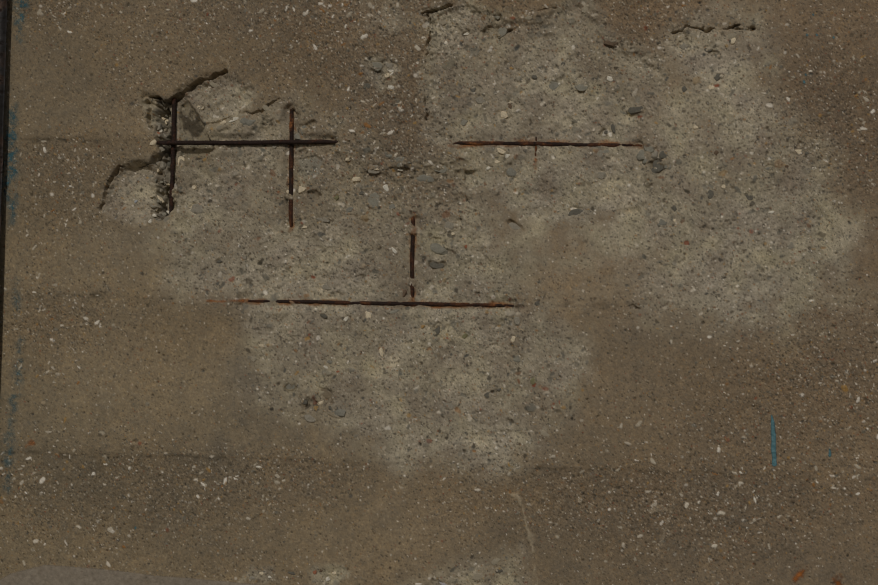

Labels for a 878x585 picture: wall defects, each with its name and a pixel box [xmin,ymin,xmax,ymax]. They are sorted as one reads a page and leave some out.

crack [420,3,454,128]
spalling [99,0,858,479]